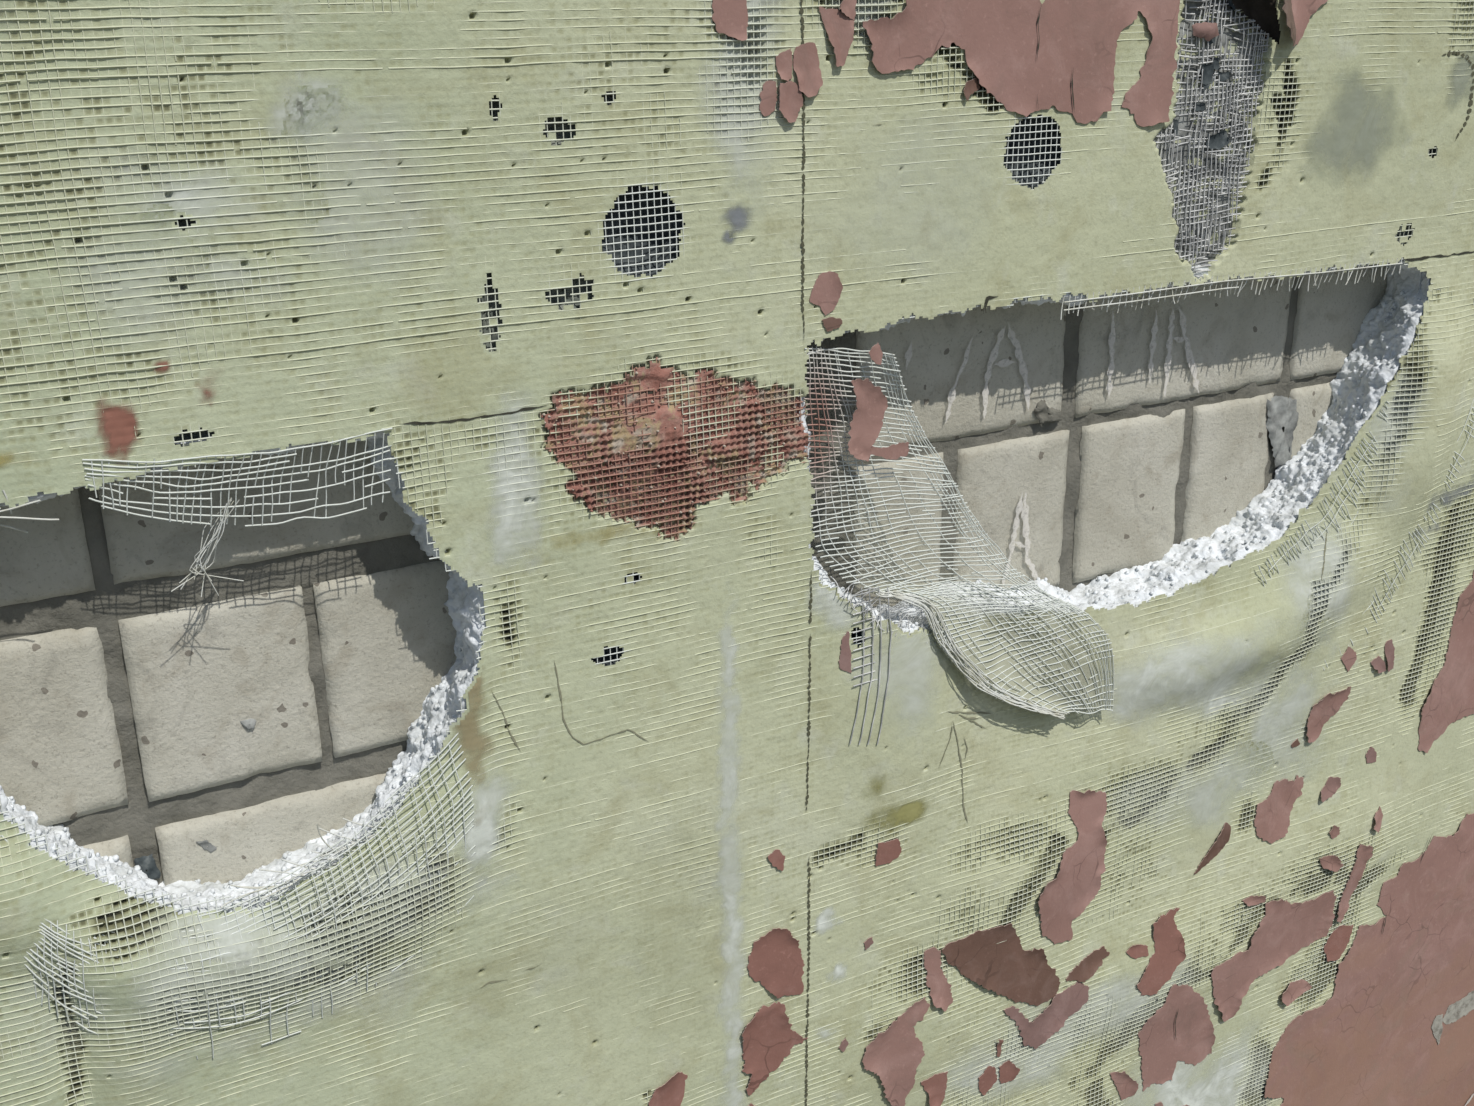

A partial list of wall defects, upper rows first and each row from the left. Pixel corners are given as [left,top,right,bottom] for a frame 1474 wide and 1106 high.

peeling [759,0,1219,189]
flaking render [1230,0,1328,47]
flaking render [602,185,685,277]
peeling [809,271,857,343]
spalling [933,223,1431,616]
spalling [0,431,486,915]
peeling [1291,639,1395,748]
peeling [1418,571,1474,753]
peeling [1254,775,1304,844]
peeling [742,928,808,1106]
peeling [839,947,953,1106]
peeling [978,789,1474,1106]